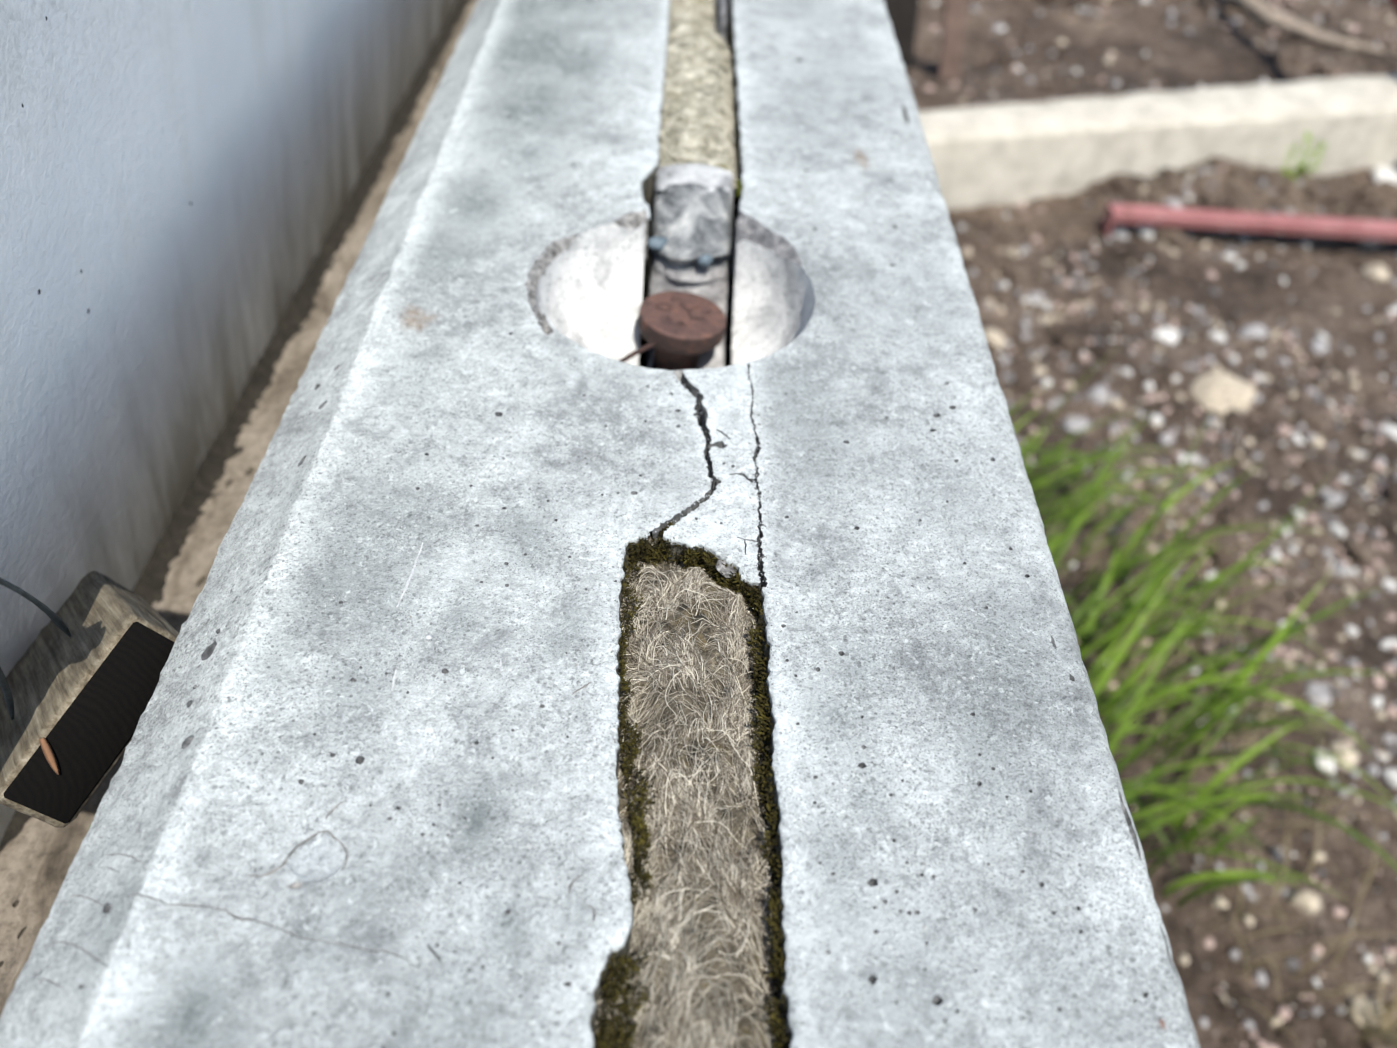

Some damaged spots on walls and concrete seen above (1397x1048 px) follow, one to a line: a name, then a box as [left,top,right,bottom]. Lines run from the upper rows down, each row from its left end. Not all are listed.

crack [652,364,768,594]